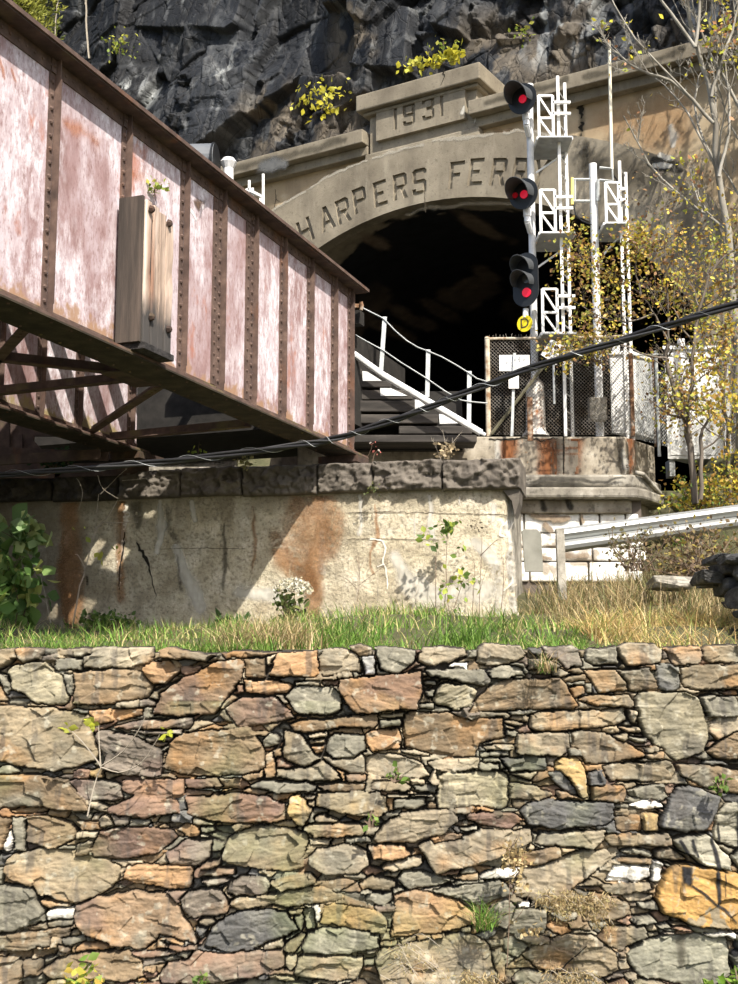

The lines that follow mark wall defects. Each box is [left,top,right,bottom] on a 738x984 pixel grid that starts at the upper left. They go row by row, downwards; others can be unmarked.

corrosion [501,439,581,475]
corrosion [626,439,634,475]
crack [349,511,508,538]
crack [117,504,156,598]
corrosion [272,495,342,619]